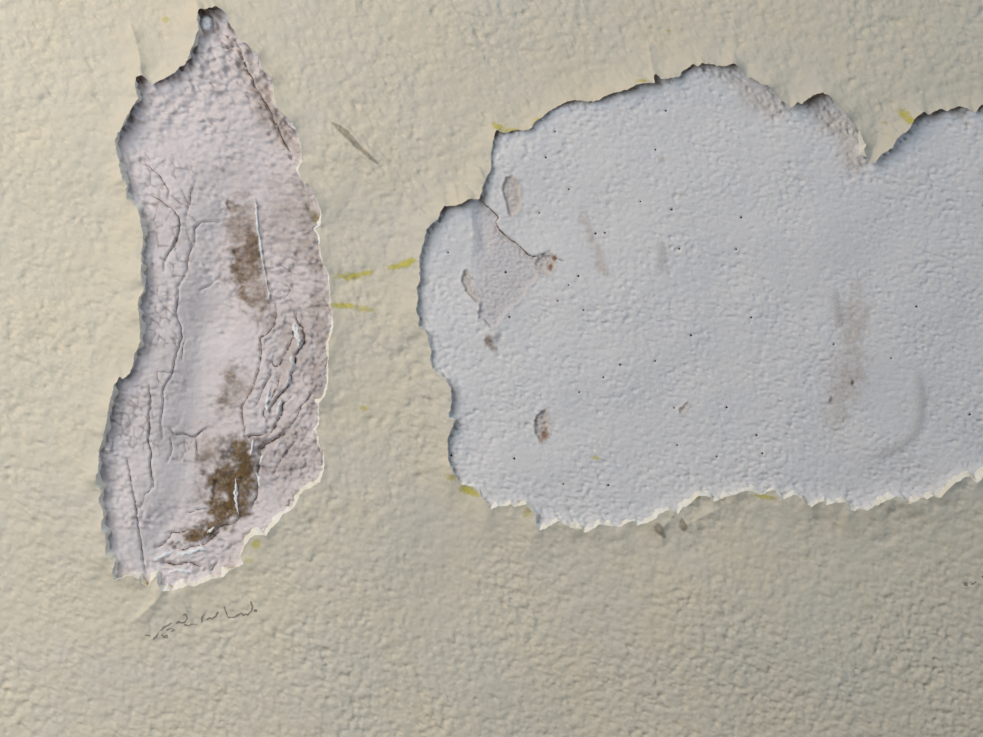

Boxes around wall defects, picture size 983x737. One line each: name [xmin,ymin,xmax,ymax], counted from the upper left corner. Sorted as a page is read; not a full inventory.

crack [146,165,219,460]
crack [156,509,239,571]
peeling [95,6,333,637]
leakage [185,441,255,541]
leakage [232,234,260,302]
crack [242,265,309,501]
peeling [416,63,983,543]